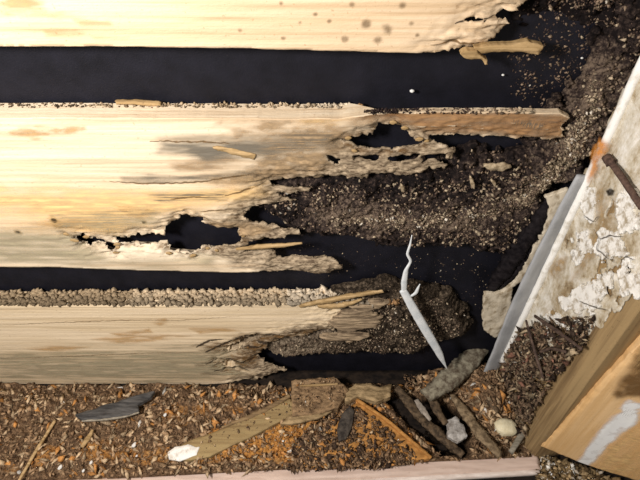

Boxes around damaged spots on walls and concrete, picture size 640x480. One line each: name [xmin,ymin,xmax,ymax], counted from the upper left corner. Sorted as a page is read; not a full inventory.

rust [589,141,607,177]
peeling [505,79,640,379]
crack [586,216,633,271]